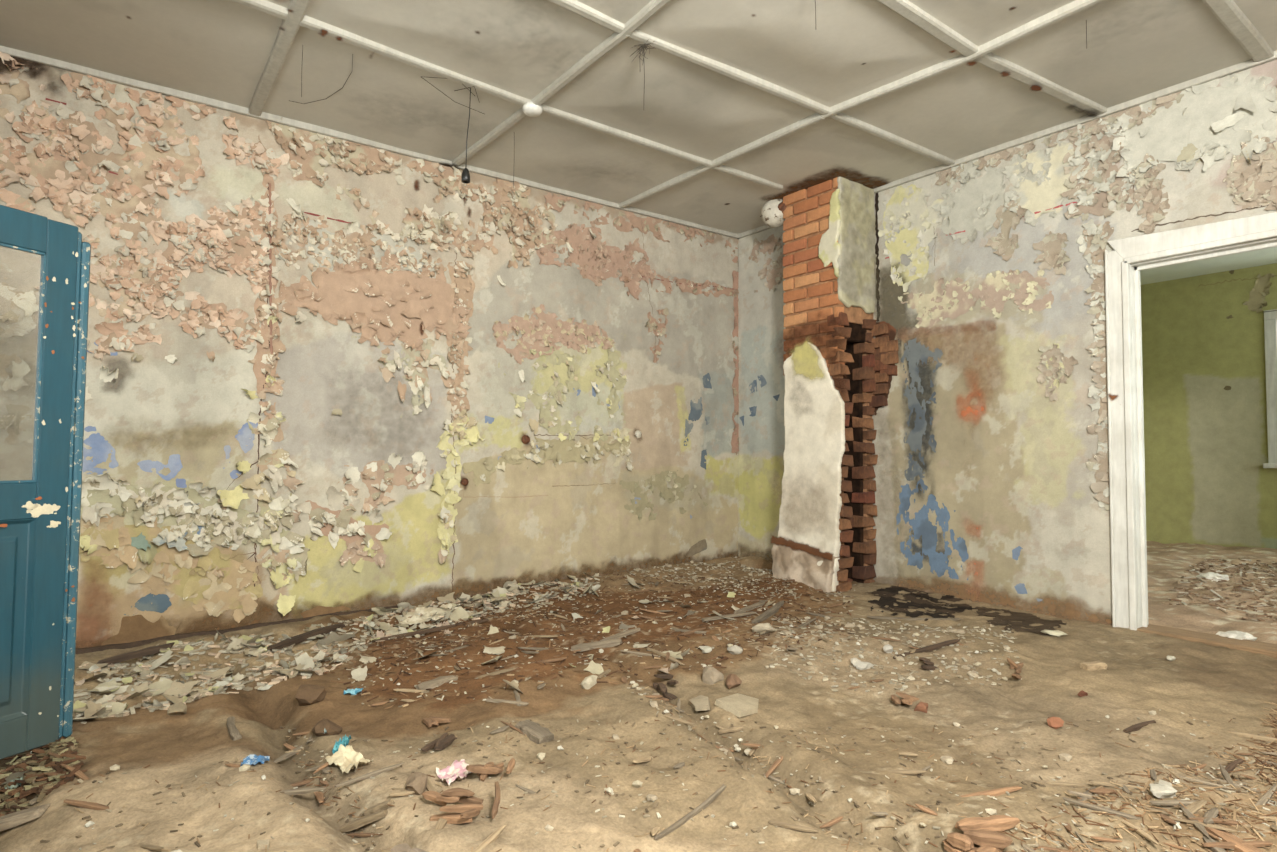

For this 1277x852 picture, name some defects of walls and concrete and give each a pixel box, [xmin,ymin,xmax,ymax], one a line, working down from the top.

peeling [878,71,1277,510]
spalling [101,615,177,646]